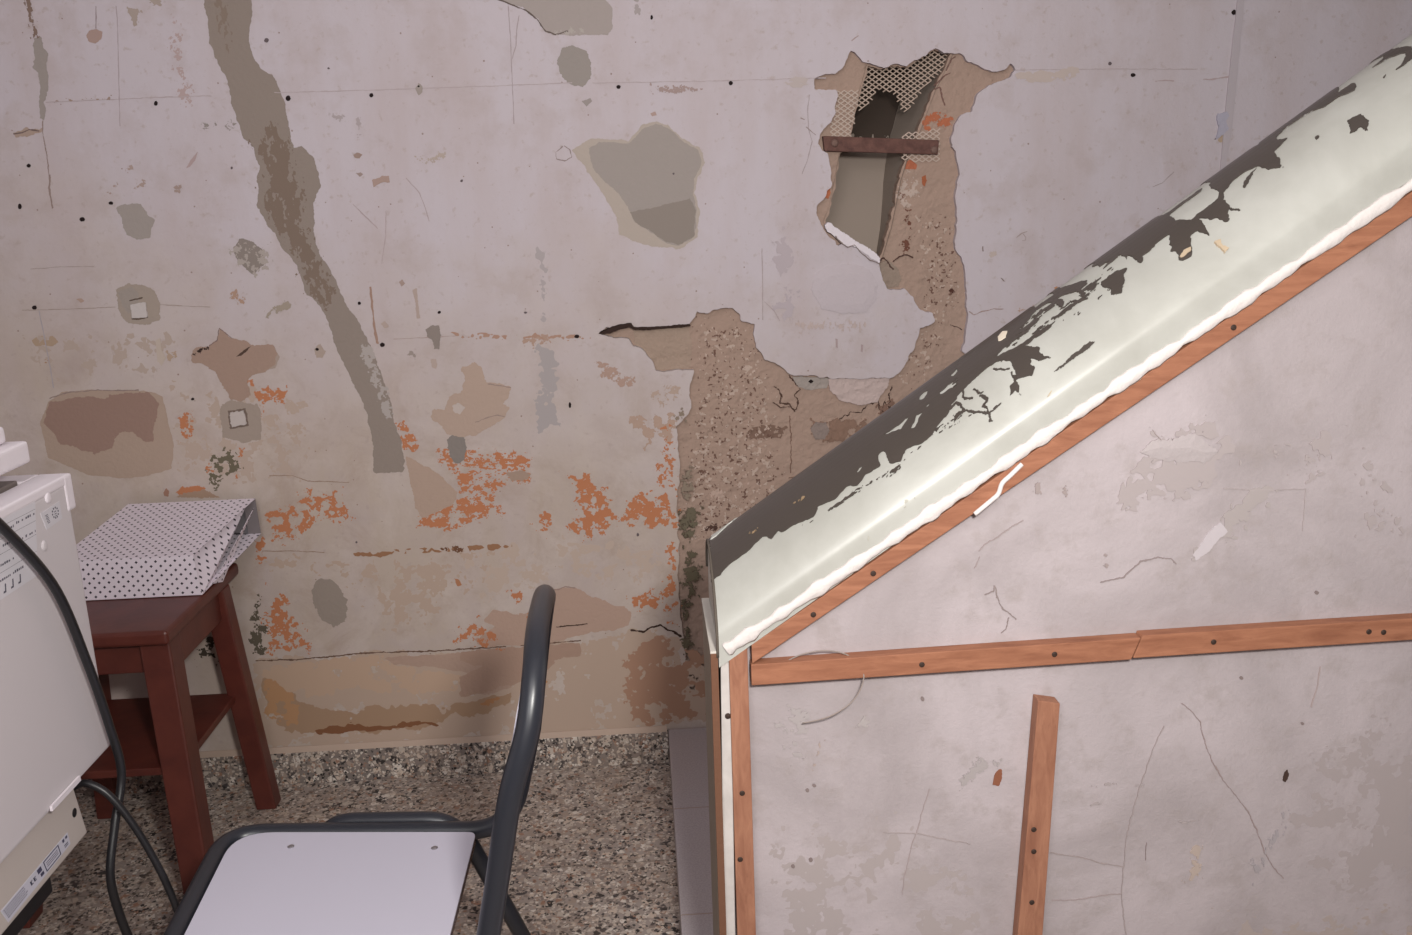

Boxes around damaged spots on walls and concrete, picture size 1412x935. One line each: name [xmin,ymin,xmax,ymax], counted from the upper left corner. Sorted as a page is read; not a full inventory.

peeling [1371,46,1412,78]
peeling [332,113,390,187]
rust [822,136,939,155]
peeling [1347,114,1369,134]
spalling [191,330,288,427]
spalling [532,49,1356,689]
spalling [44,392,159,455]
peeling [395,420,419,452]
spalling [416,362,532,532]
rust [353,544,509,558]
damp [248,466,706,747]